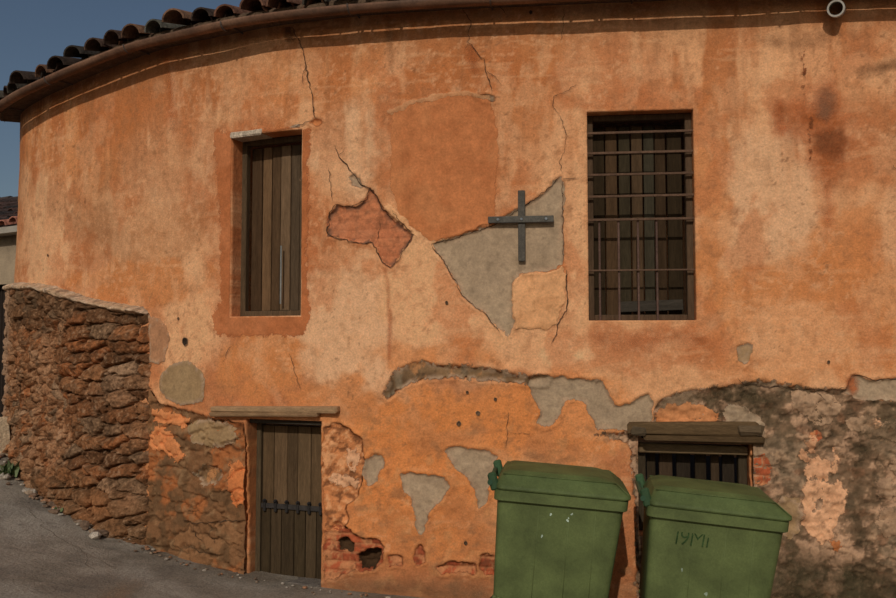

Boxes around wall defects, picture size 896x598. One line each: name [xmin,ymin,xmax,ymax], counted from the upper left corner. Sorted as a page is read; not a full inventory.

crack [292,28,315,126]
crack [463,11,501,89]
flaking render [327,174,413,267]
crack [326,86,582,344]
peeling [382,359,539,399]
flaking render [144,389,246,575]
flaking render [321,422,385,580]
flaking render [400,472,450,566]
flaking render [435,553,495,575]
flaking render [444,446,498,508]
flaking render [594,432,643,598]
flaking render [652,378,896,598]